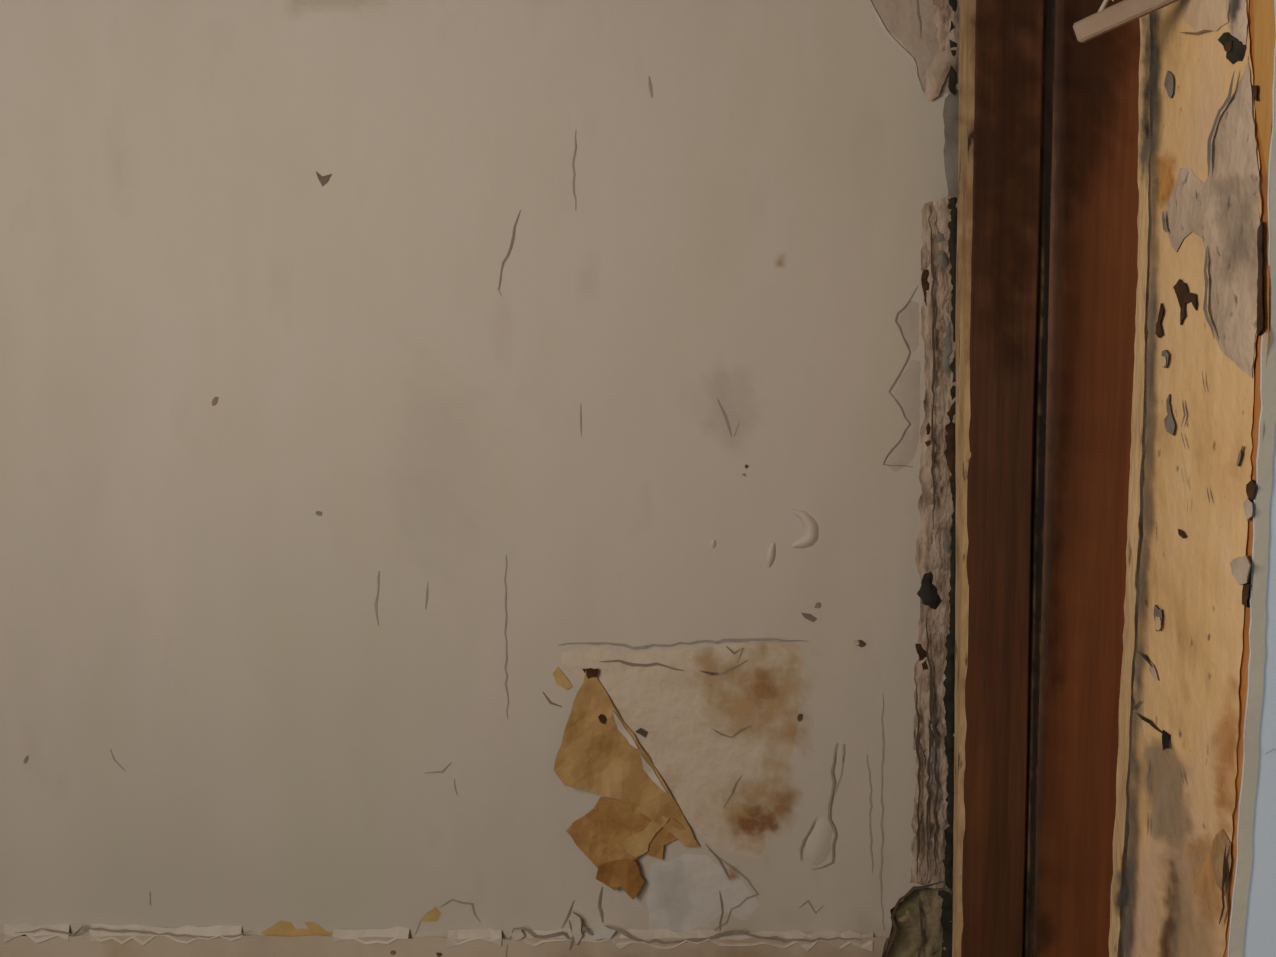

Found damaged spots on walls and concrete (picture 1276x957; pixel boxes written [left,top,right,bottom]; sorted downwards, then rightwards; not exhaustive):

peeling [868,0,960,101]
flaking render [1162,0,1260,378]
crack [498,210,521,296]
water stain [1136,12,1171,618]
flaking render [1155,303,1169,368]
peeling [523,196,958,957]
water stain [1116,636,1187,957]
peeling [4,924,70,943]
peeling [90,924,242,945]
peeling [261,899,502,957]
water stain [1160,874,1201,957]